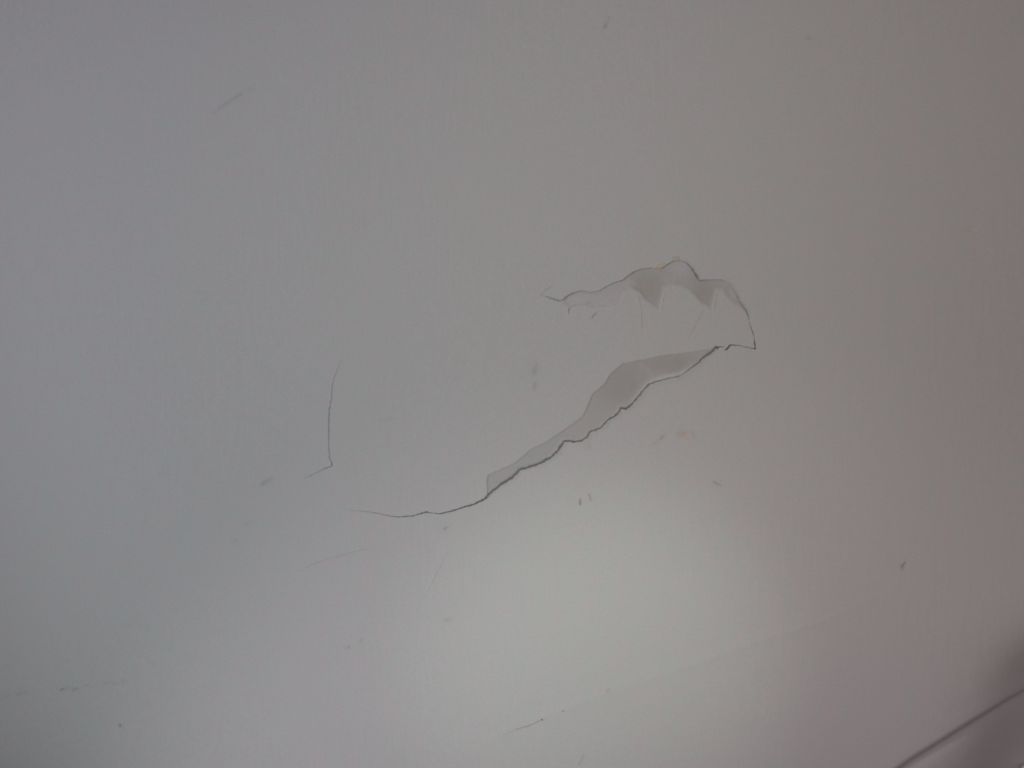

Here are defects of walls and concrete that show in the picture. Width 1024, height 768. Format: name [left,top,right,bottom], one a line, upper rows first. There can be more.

peeling [541,256,751,315]
peeling [486,347,717,498]
crack [414,496,487,516]